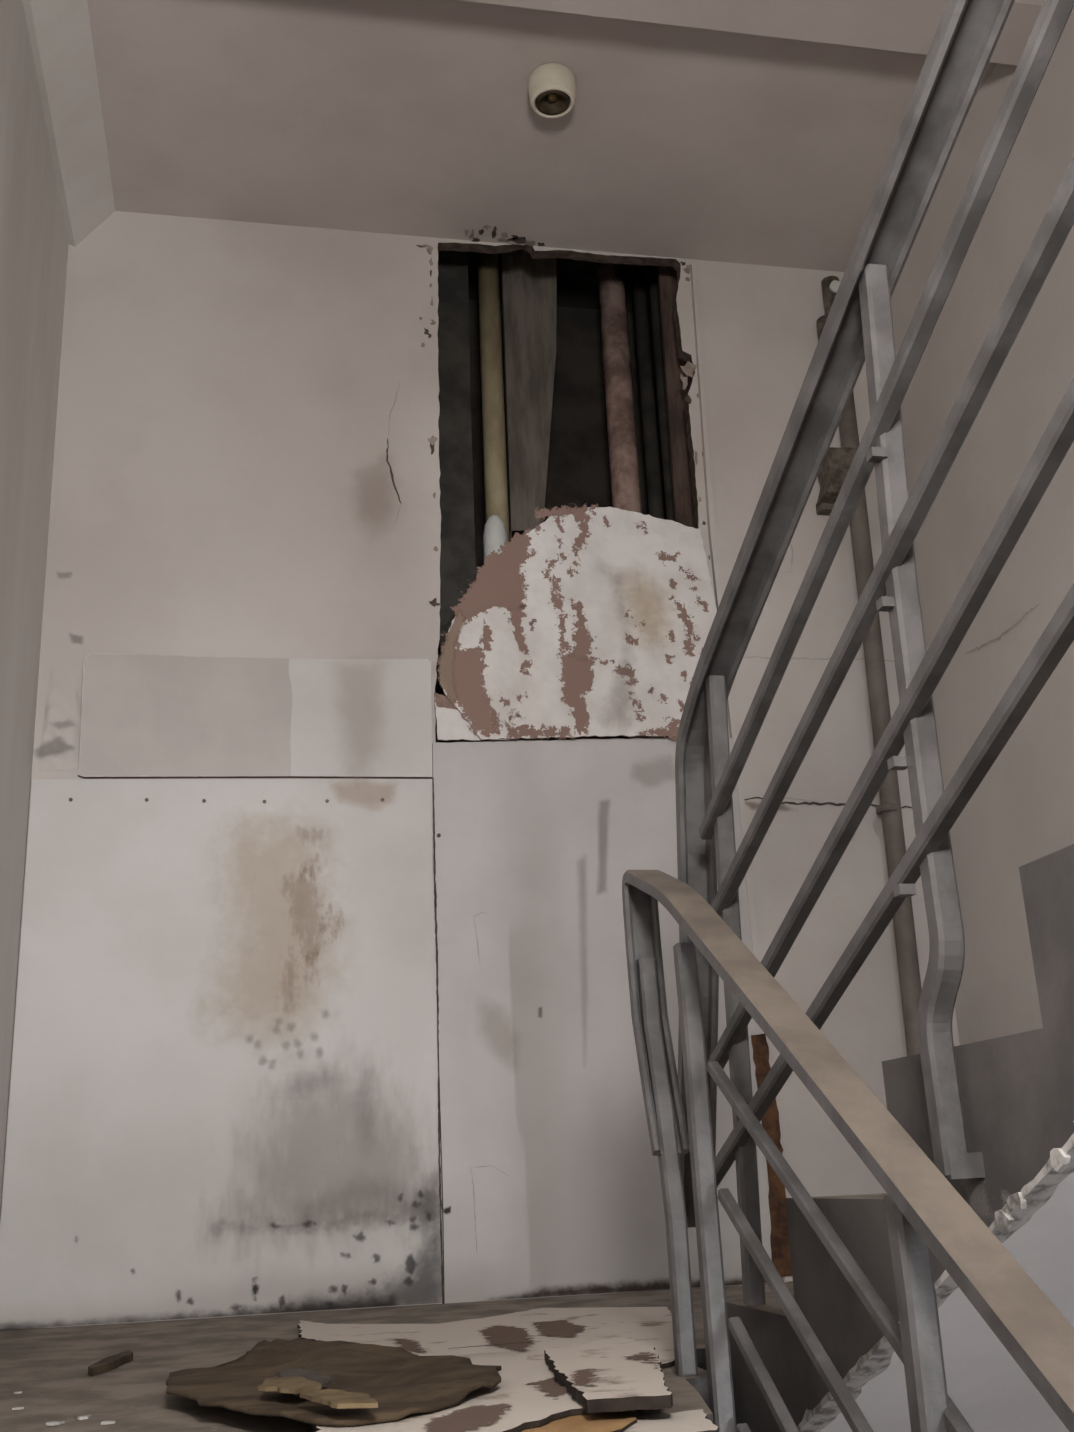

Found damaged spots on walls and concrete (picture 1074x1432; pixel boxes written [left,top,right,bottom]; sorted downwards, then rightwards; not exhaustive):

flaking render [680,361,699,404]
peeling [429,503,685,742]
peeling [654,551,709,685]
crack [966,604,1039,653]
spalling [989,1121,1074,1243]
damp [211,1286,393,1317]
damp [406,1256,415,1284]
spalling [935,1270,958,1308]
spalling [843,1336,894,1400]
spalling [797,1392,842,1432]